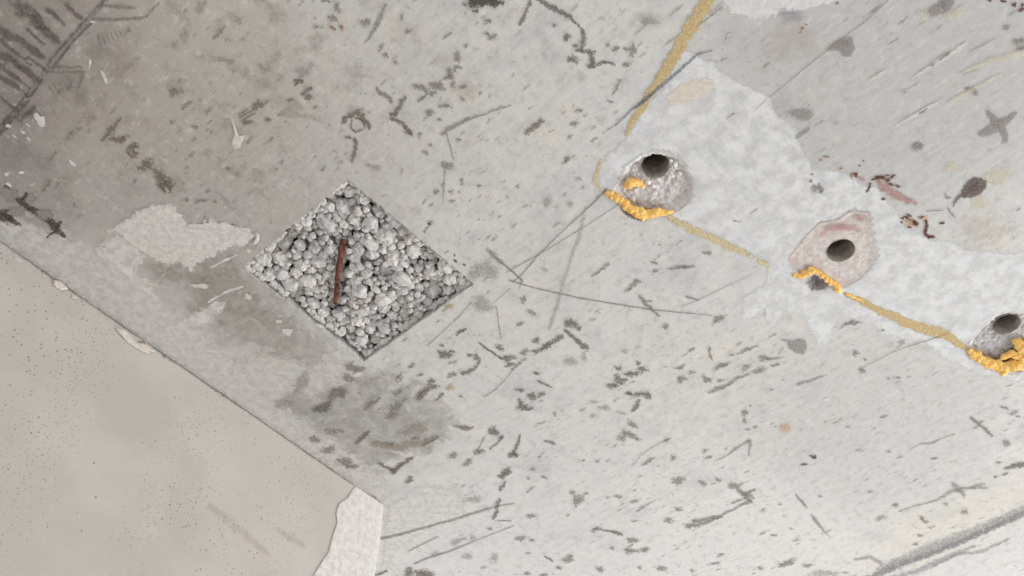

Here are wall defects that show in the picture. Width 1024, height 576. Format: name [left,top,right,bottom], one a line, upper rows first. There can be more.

crack [603,50,712,133]
crack [756,0,888,109]
rust [333,238,346,305]
crack [789,211,870,258]
rust [839,160,945,239]
crack [861,333,948,369]